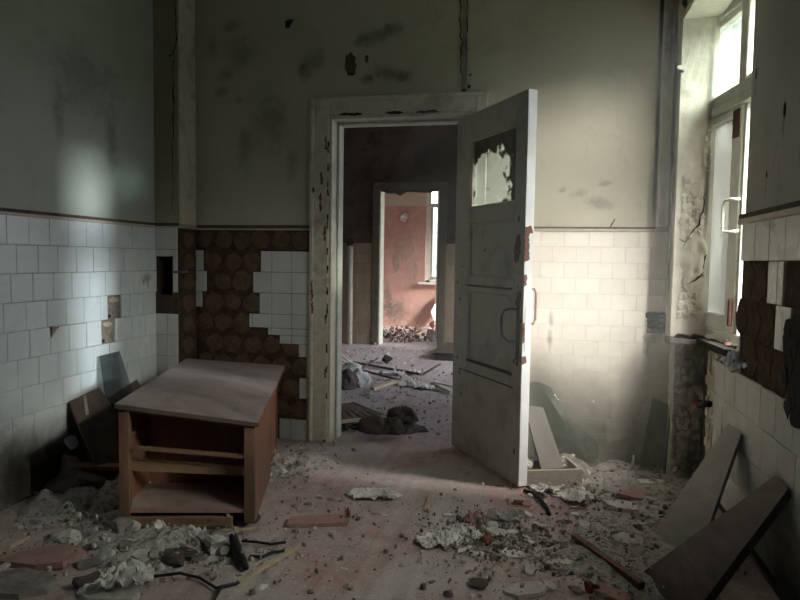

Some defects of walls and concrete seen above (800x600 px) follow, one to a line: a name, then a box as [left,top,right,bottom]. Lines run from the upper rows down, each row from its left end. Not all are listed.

crack [168,2,177,202]
peeling [345,50,368,76]
peeling [475,128,517,202]
peeling [678,129,712,247]
peeling [101,295,120,343]
peeling [158,228,309,438]
peeling [676,261,800,465]